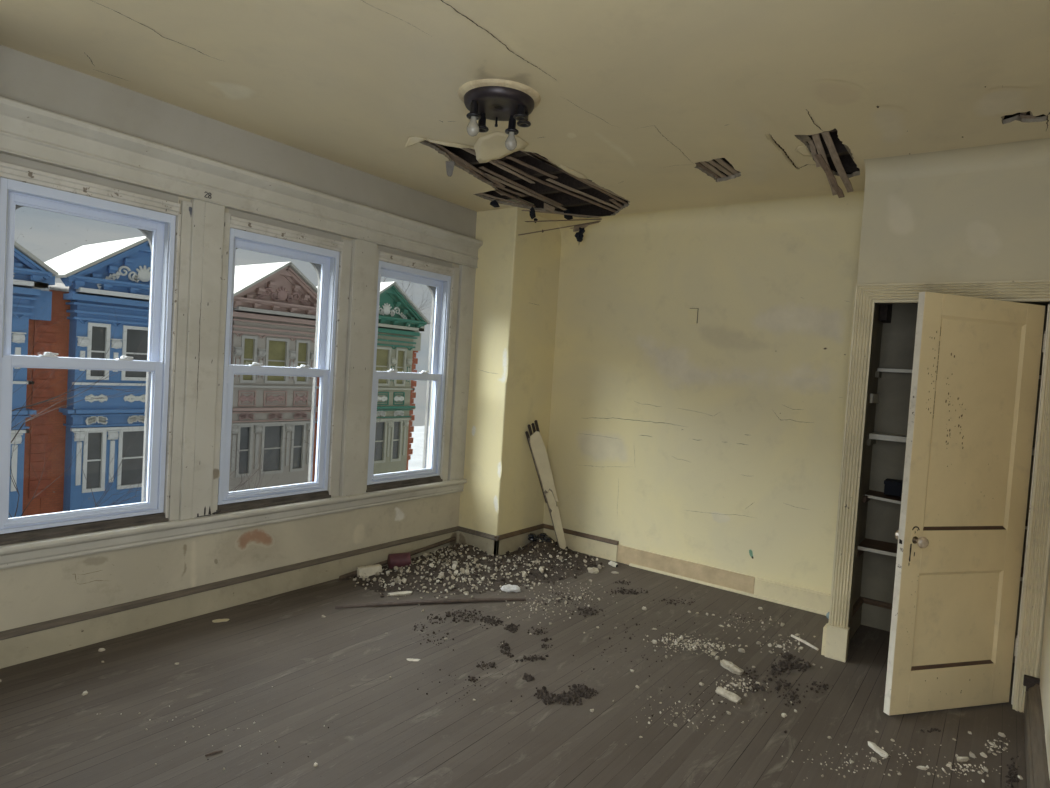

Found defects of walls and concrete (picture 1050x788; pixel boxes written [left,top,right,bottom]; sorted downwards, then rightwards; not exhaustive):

crack [441,0,609,124]
peeling [404,131,528,163]
crack [765,134,806,170]
peeling [558,165,587,179]